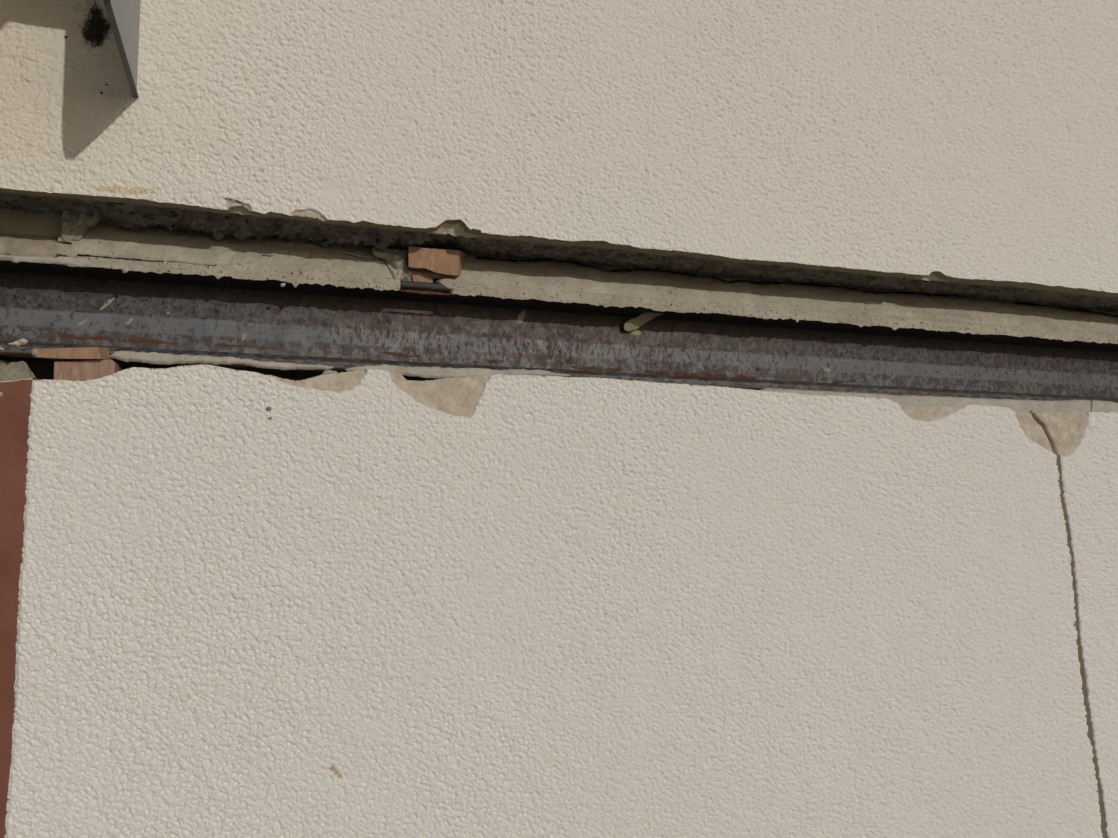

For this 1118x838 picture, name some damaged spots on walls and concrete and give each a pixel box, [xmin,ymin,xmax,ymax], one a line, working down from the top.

spalling [292,210,326,221]
rust [45,334,173,344]
spalling [262,370,366,393]
rust [644,370,758,380]
spalling [389,372,489,418]
spalling [900,405,968,422]
spalling [1015,412,1088,457]
crack [1028,410,1108,838]